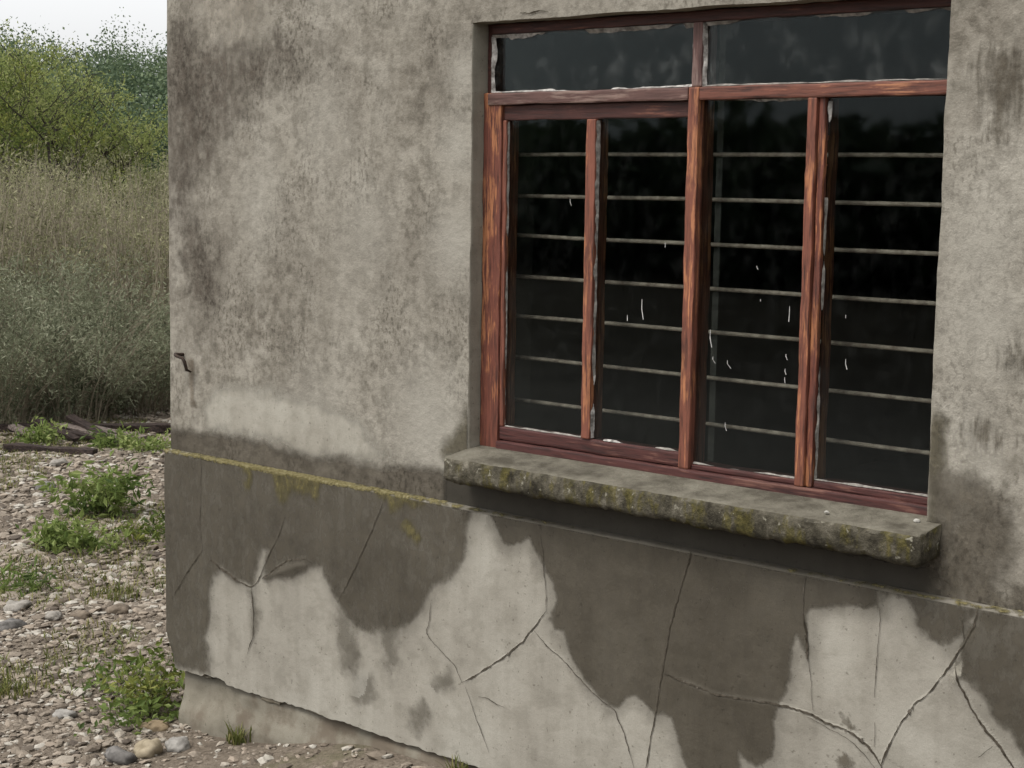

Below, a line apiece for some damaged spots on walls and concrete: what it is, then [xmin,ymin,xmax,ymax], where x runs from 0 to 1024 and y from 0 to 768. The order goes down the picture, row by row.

crack [171,453,311,654]
leakage [164,414,1024,768]
crack [426,523,1014,768]